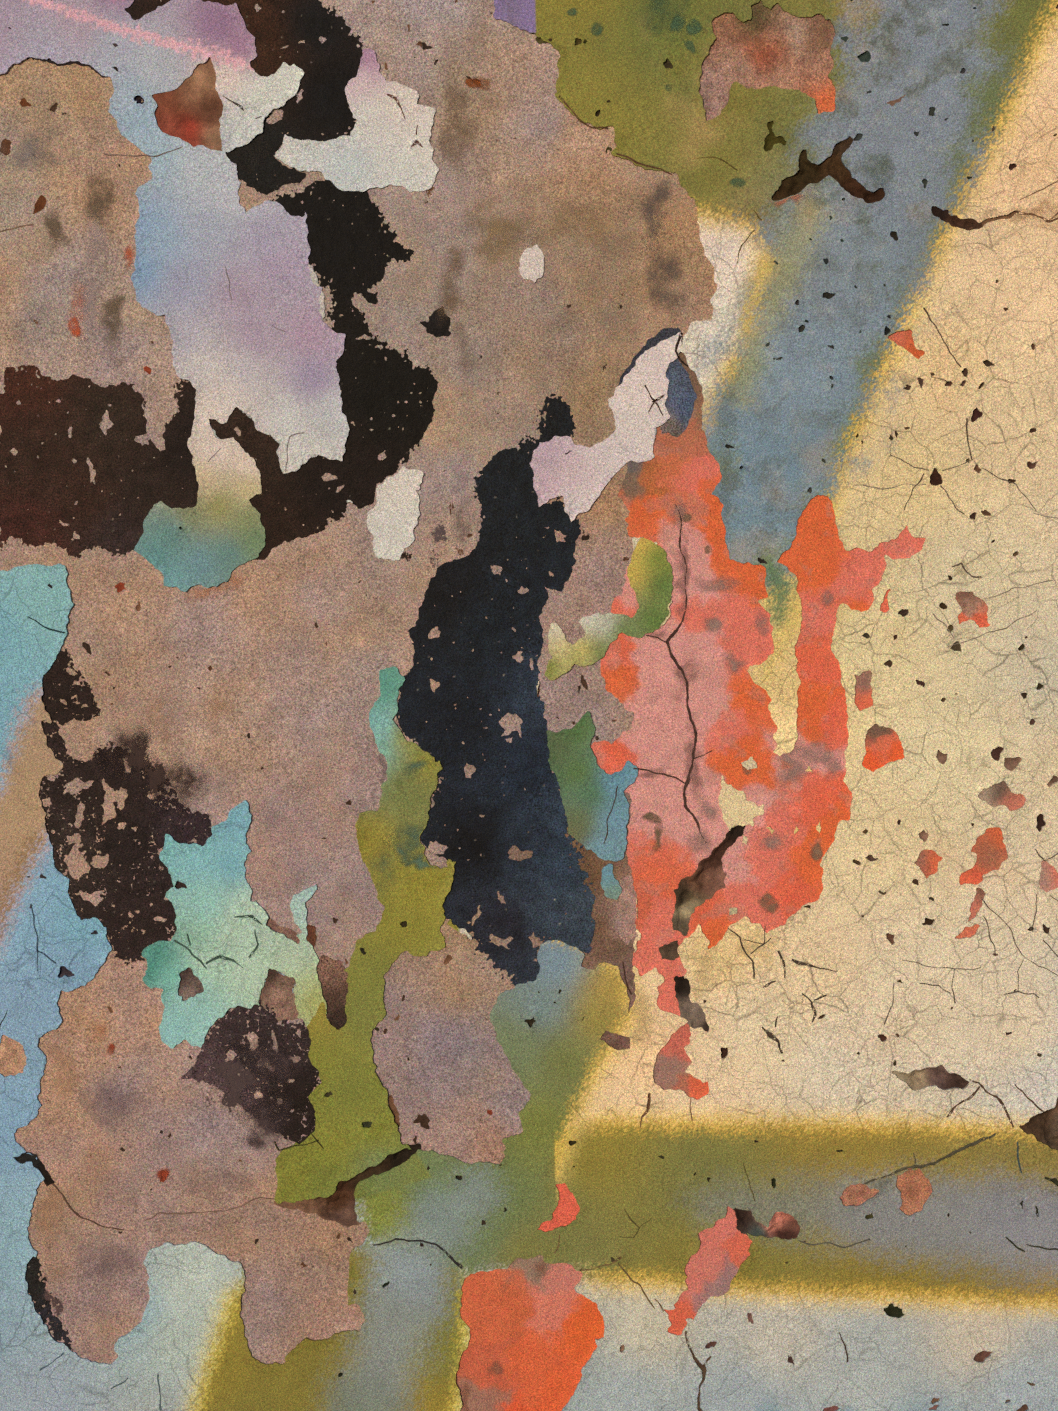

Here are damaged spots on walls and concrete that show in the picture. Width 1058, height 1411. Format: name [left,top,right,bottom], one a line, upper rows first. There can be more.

peeling [698,1,848,121]
spalling [857,51,871,62]
spalling [763,121,885,203]
crack [969,181,1058,230]
flaking render [0,0,717,1364]
crack [603,504,712,844]
spalling [659,825,745,1032]
crack [728,926,837,1054]
crack [884,849,1058,1025]
crack [864,1080,1058,1252]
spalling [1019,1097,1058,1150]
crack [554,1209,712,1411]